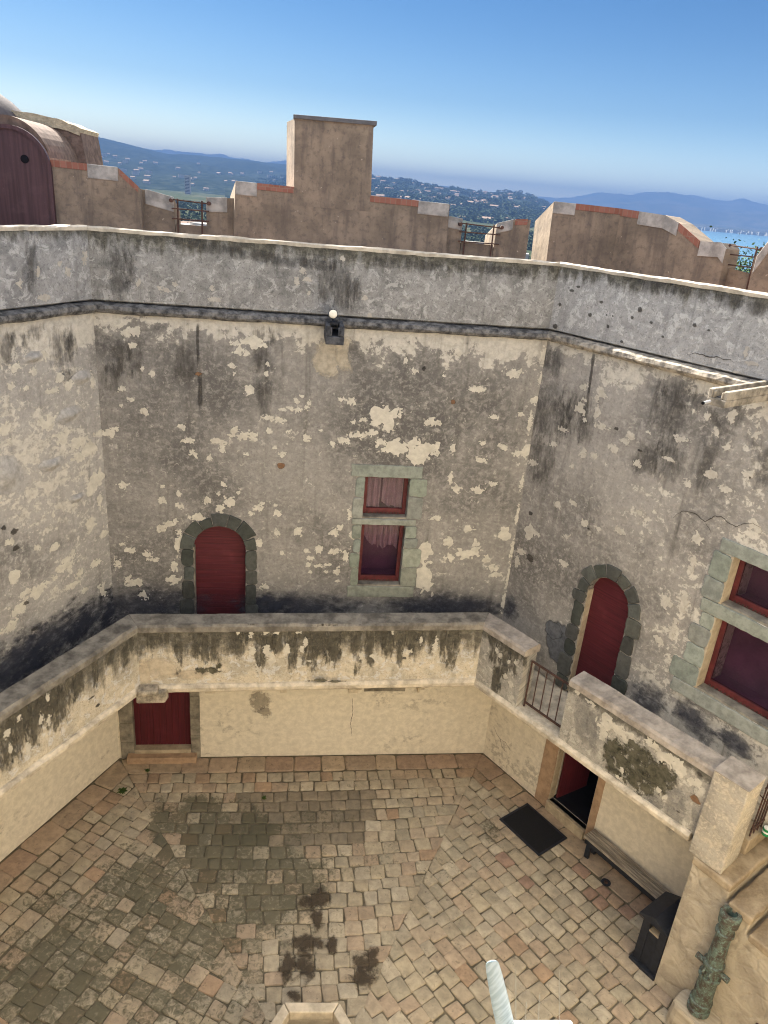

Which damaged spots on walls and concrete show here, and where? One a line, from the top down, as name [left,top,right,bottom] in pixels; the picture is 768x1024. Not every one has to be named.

leakage [176,326,202,407]
peeling [228,335,268,376]
peeling [177,394,456,466]
peeling [569,383,651,469]
peeling [703,409,738,451]
peeling [416,345,546,614]
peeling [294,506,354,582]
crack [673,511,761,532]
leakage [392,594,516,617]
leakage [0,587,461,772]
leakage [488,636,527,693]
leakage [634,686,751,759]